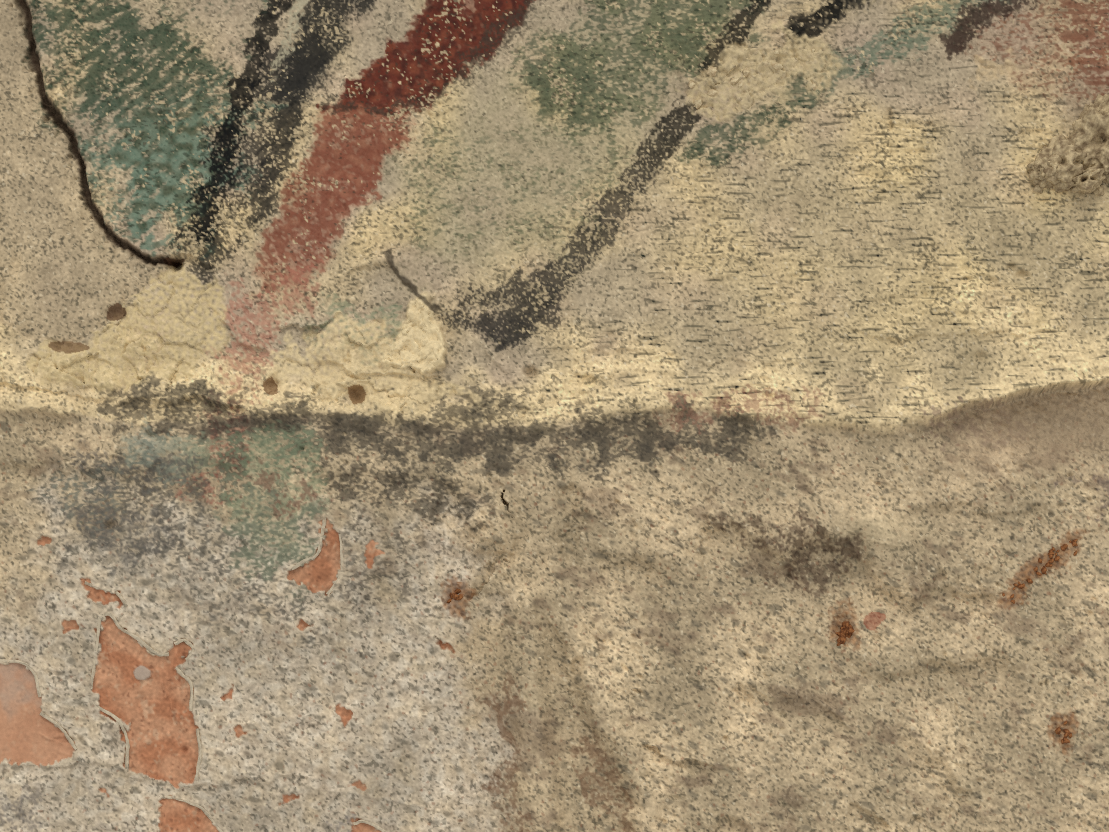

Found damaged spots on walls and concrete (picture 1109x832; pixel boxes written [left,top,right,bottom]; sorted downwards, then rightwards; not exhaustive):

crack [15,0,191,270]
crack [812,323,1093,348]
peeling [288,517,344,596]
rust [990,527,1094,615]
peeling [62,620,79,634]
peeling [0,659,77,768]
peeling [81,578,223,832]
peeling [351,818,386,832]